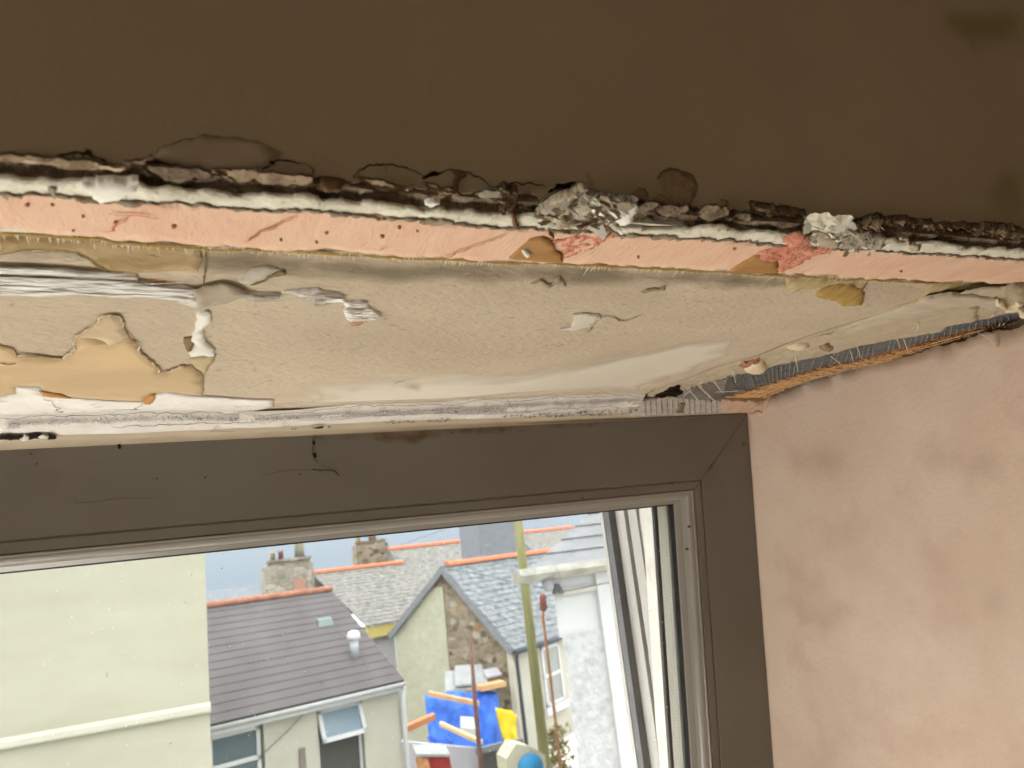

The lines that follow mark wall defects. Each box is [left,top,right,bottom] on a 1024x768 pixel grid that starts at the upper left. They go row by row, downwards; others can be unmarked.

spalling [0,151,543,216]
spalling [509,200,615,263]
spalling [633,167,868,307]
spalling [850,212,1024,249]
peeling [980,331,1000,347]
peeling [0,386,274,415]